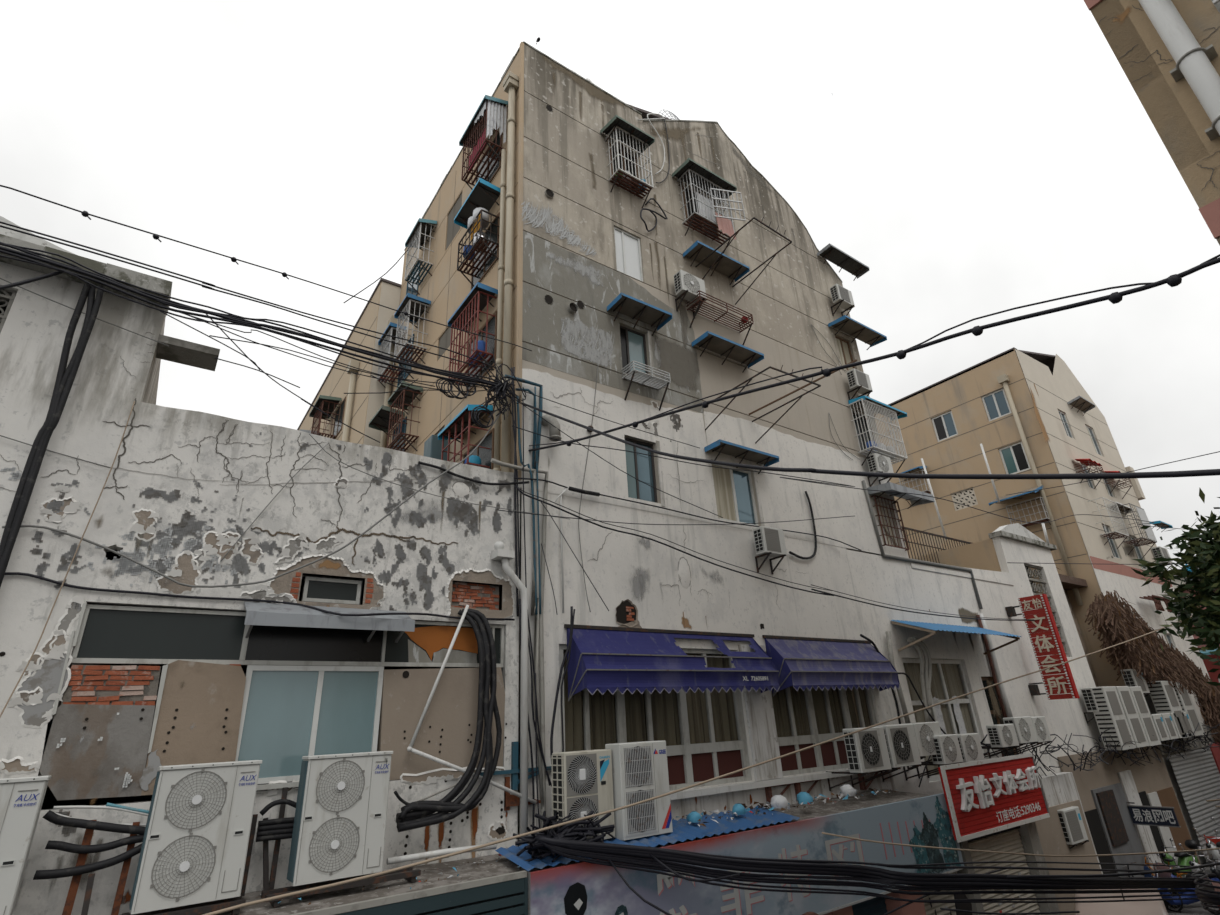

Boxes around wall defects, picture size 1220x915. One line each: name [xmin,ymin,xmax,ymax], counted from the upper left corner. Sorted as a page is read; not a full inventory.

water stain [542,55,626,135]
water stain [652,128,716,166]
water stain [733,147,770,192]
water stain [521,201,600,285]
water stain [649,219,668,292]
water stain [655,304,699,392]
crack [0,332,511,565]
peeling [8,445,515,729]